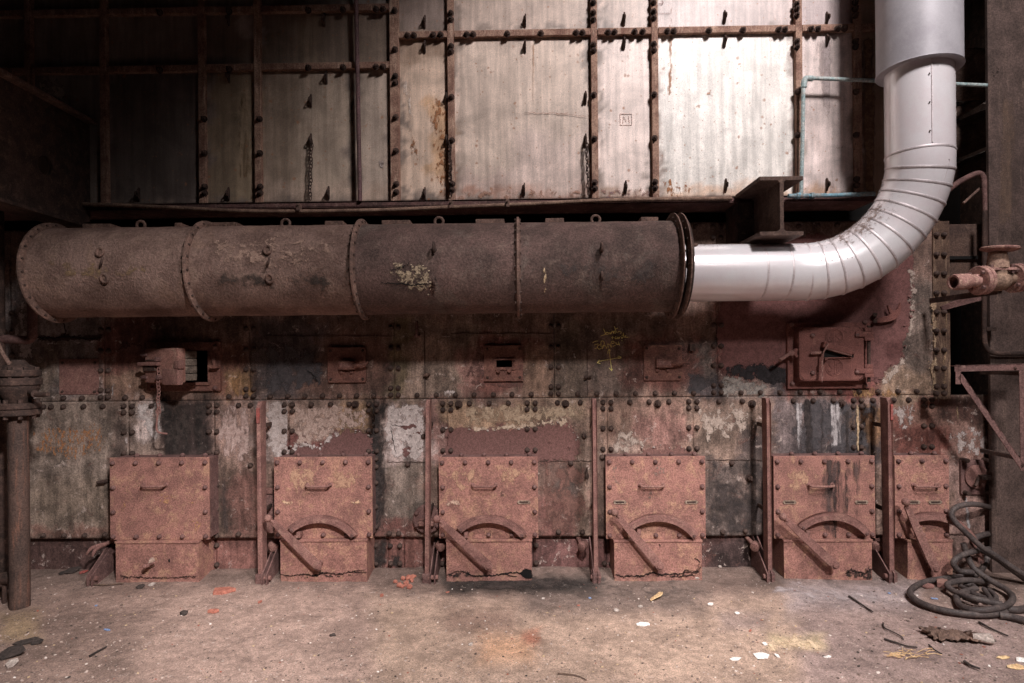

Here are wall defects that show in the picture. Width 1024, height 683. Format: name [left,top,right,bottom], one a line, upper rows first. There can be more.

corrosion [430,98,448,193]
peeling [786,233,837,244]
peeling [698,255,921,442]
peeling [266,401,426,460]
peeling [444,404,584,462]
damp [790,399,878,538]